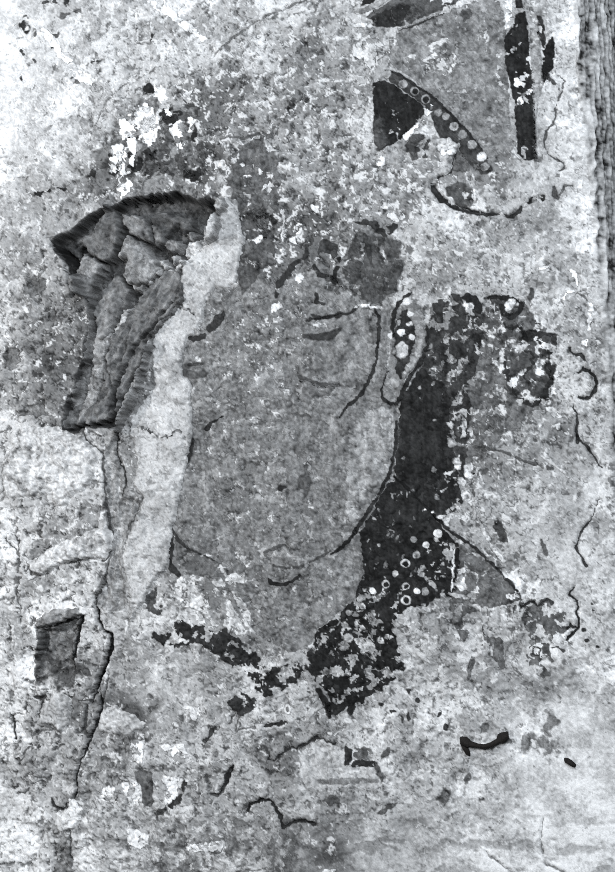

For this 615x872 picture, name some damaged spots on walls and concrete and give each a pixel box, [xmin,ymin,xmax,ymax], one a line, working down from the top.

crack [141,426,182,438]
crack [569,347,603,468]
spalling [34,608,92,692]
crack [13,428,144,810]
crack [53,832,73,872]
crack [541,818,565,872]